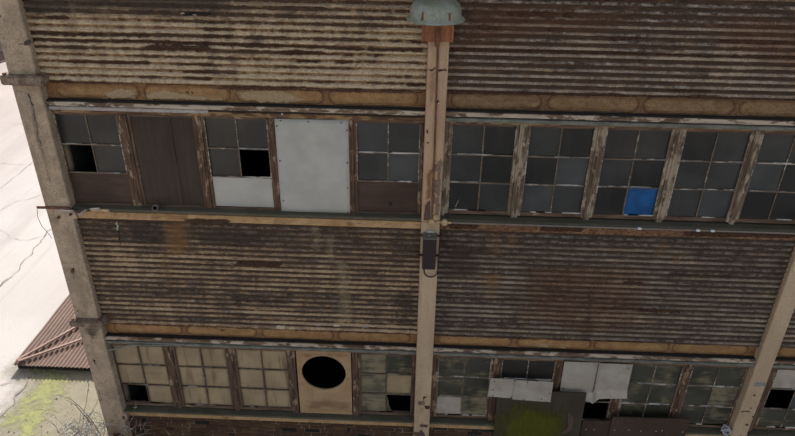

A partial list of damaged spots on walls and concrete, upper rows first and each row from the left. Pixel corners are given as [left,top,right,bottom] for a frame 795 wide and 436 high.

rust [30,27,423,64]
rust [449,48,795,59]
rust [180,63,212,81]
rust [216,83,425,93]
rust [447,89,795,101]